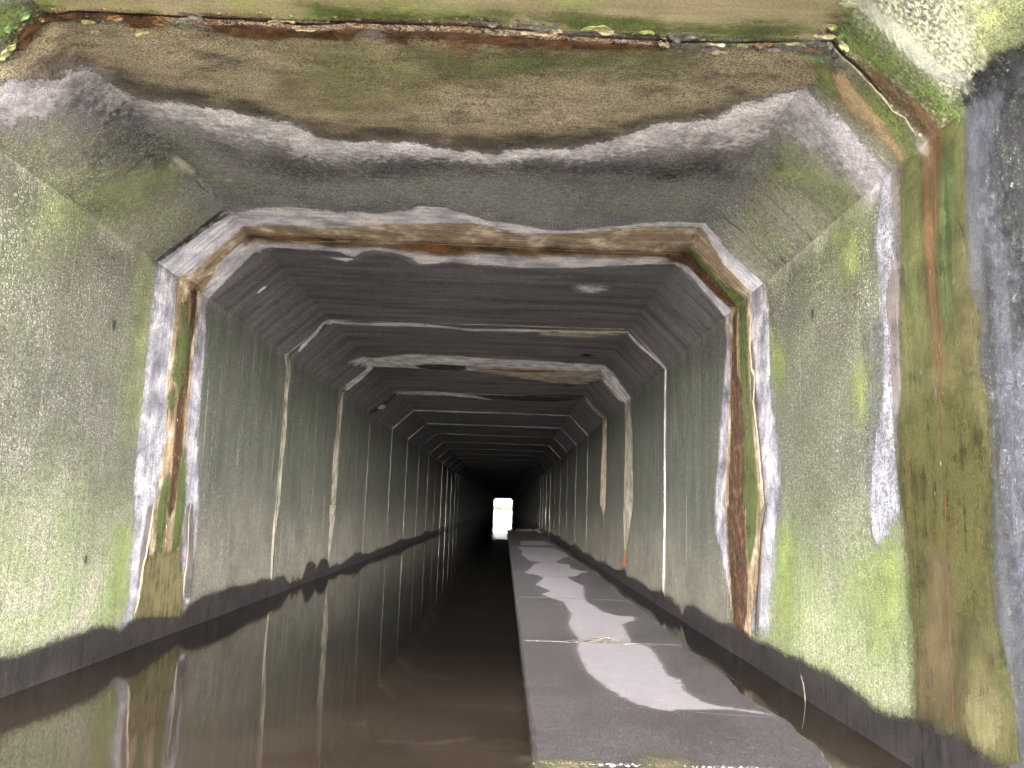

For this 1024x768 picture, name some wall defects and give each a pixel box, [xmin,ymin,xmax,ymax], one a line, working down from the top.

corrosion [13,12,163,54]
corrosion [205,14,661,53]
corrosion [168,289,197,518]
corrosion [260,236,747,632]
water stain [0,0,1024,610]
corrosion [855,62,944,376]
corrosion [919,555,953,719]